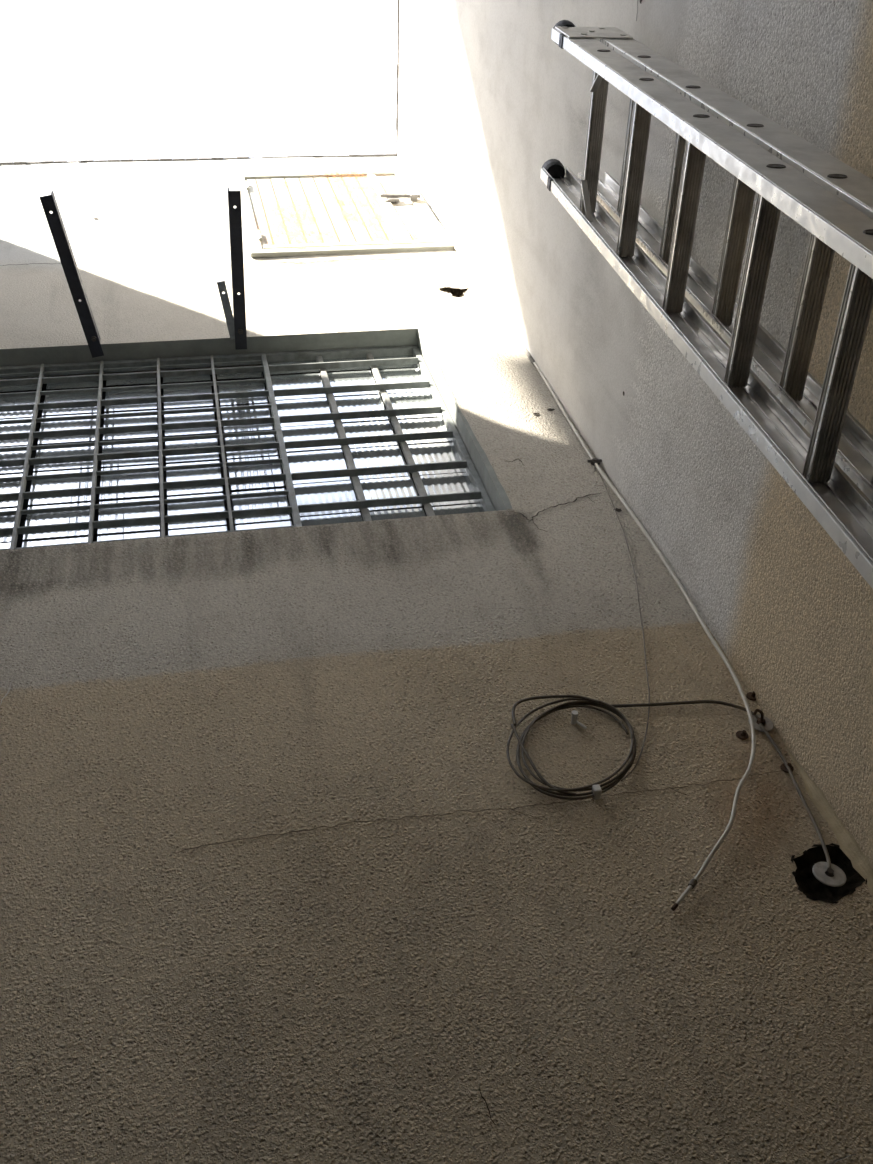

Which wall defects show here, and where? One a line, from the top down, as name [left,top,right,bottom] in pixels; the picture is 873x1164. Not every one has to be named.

crack [507,493,600,532]
crack [173,770,782,853]
spalling [791,843,867,903]